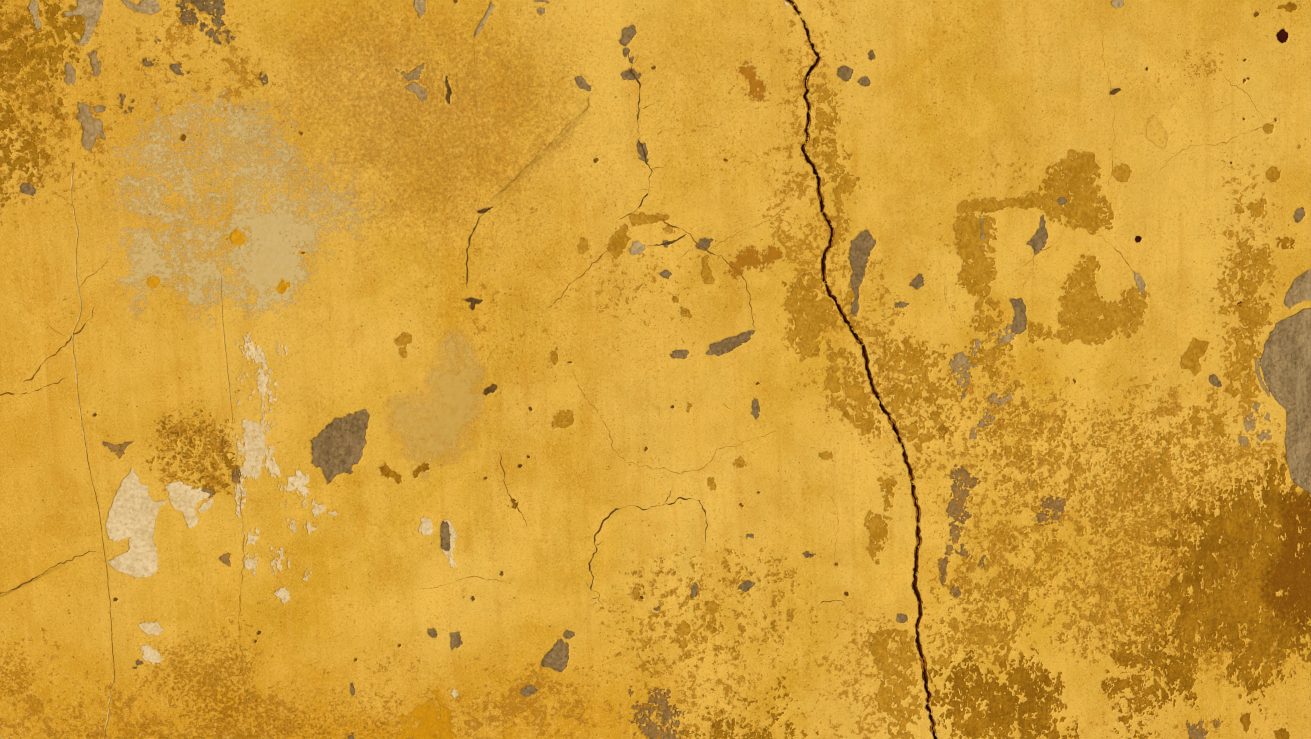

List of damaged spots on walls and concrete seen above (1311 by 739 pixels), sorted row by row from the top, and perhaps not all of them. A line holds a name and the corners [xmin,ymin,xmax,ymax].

crack [0,163,132,737]
peeling [0,0,135,208]
peeling [122,0,236,45]
peeling [103,332,370,604]
crack [500,457,527,526]
crack [548,251,607,308]
crack [573,373,779,606]
crack [621,50,788,331]
peeling [706,330,755,356]
crack [785,0,938,739]
peeling [782,66,1311,739]
peeling [609,534,819,739]